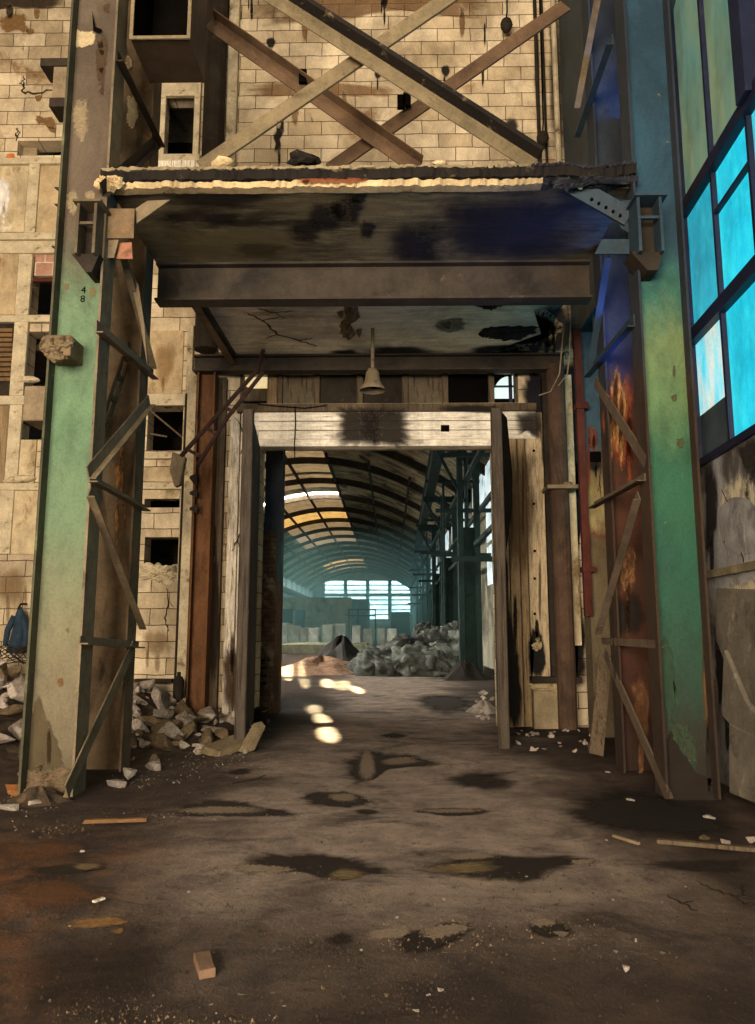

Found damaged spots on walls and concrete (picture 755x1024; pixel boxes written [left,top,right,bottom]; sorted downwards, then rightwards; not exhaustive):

peeling [76,30,107,95]
crack [19,76,52,95]
peeling [73,102,87,141]
damp [360,221,376,237]
crack [247,308,316,346]
spalling [337,306,362,340]
rust [587,366,634,487]
rust [620,549,637,631]